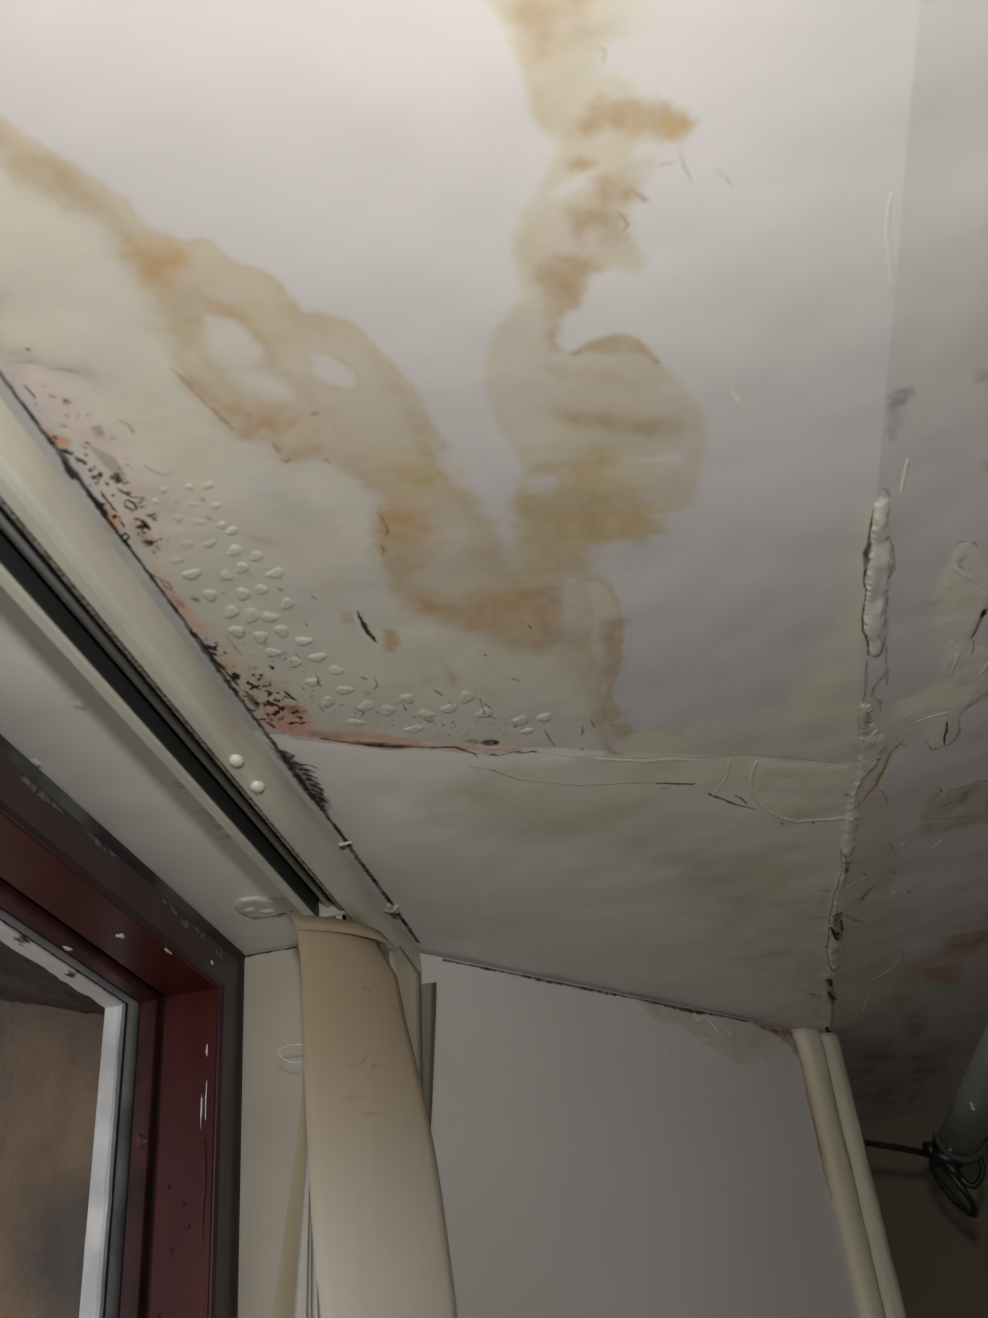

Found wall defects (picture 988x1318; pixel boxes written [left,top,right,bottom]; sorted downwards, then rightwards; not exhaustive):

damp [0,0,918,1029]
crack [0,287,814,1030]
peeling [908,778,988,841]
damp [629,996,787,1075]
damp [836,1027,985,1125]